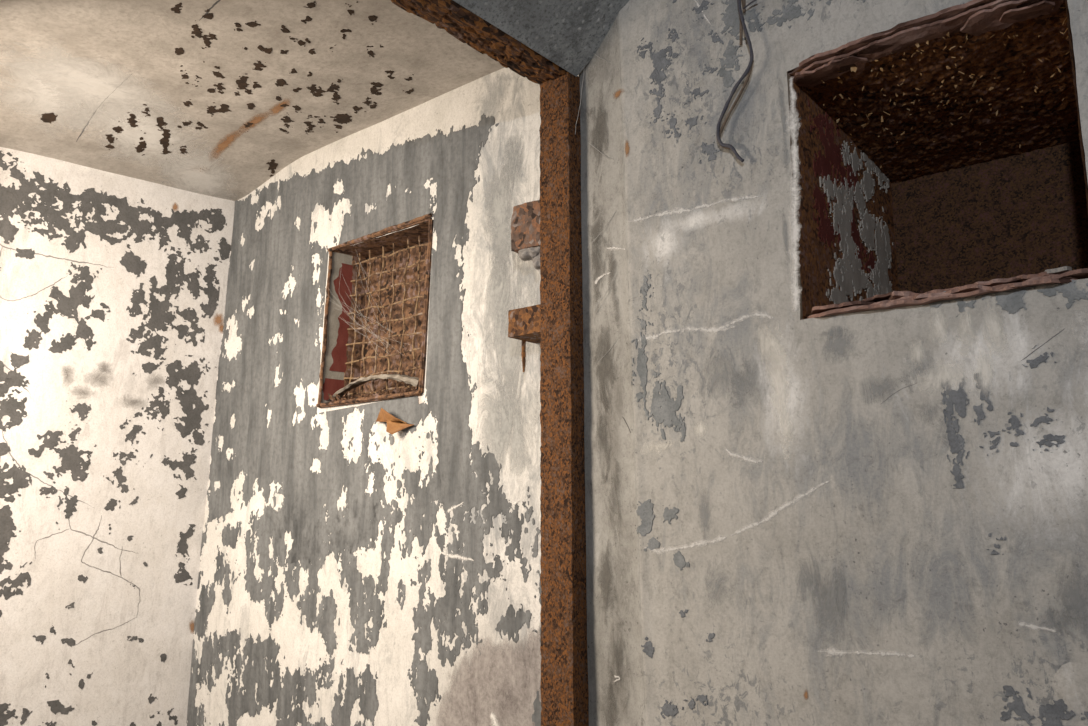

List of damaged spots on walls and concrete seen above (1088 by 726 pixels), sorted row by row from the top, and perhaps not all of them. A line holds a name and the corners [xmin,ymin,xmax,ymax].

spalling [105,9,316,160]
spalling [275,68,414,134]
peeling [637,28,709,141]
peeling [692,0,832,92]
peeling [819,141,893,304]
flaking render [922,279,1088,314]
peeling [631,274,686,443]
peeling [0,112,542,726]
peeling [941,373,1065,488]
peeling [636,499,679,552]
peeling [660,694,708,718]
peeling [1000,685,1088,726]